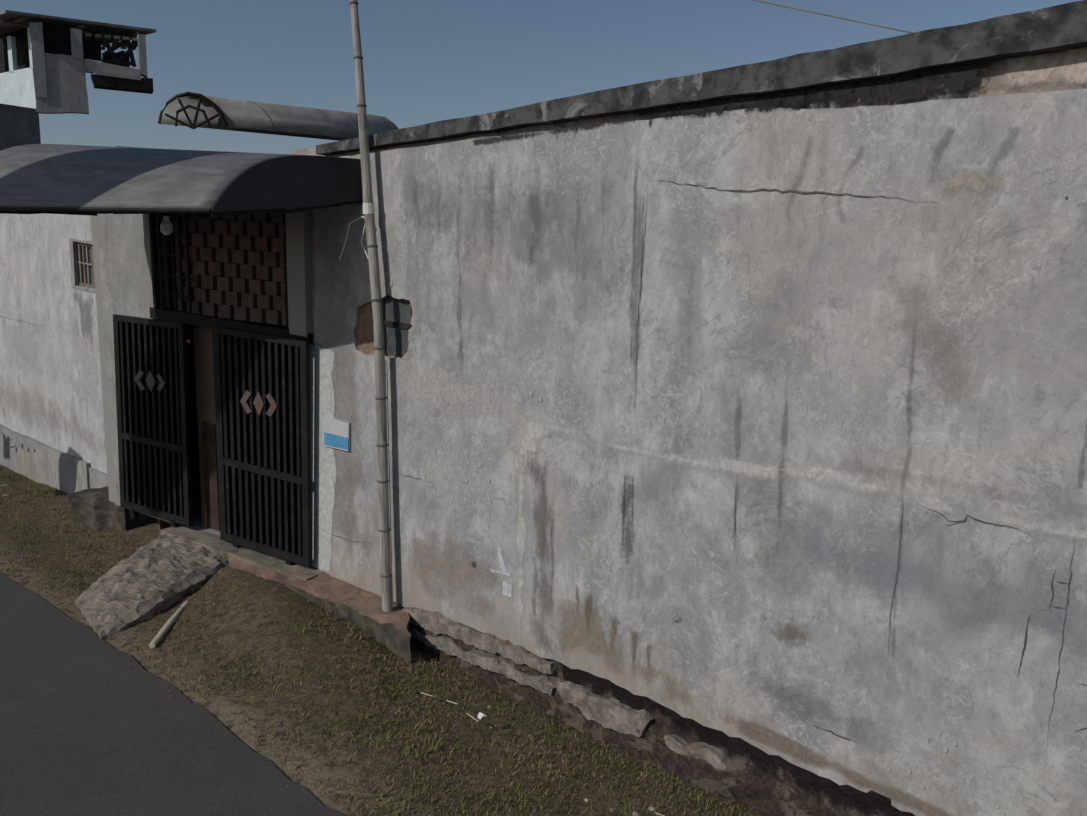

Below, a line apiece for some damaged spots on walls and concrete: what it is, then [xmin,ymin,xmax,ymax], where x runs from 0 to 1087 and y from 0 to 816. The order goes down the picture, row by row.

flaking render [356,298,387,356]
crack [634,180,938,424]
water stain [516,462,550,622]
water stain [561,590,620,673]
water stain [621,484,633,552]
crack [887,495,1038,676]
crack [1017,538,1087,756]